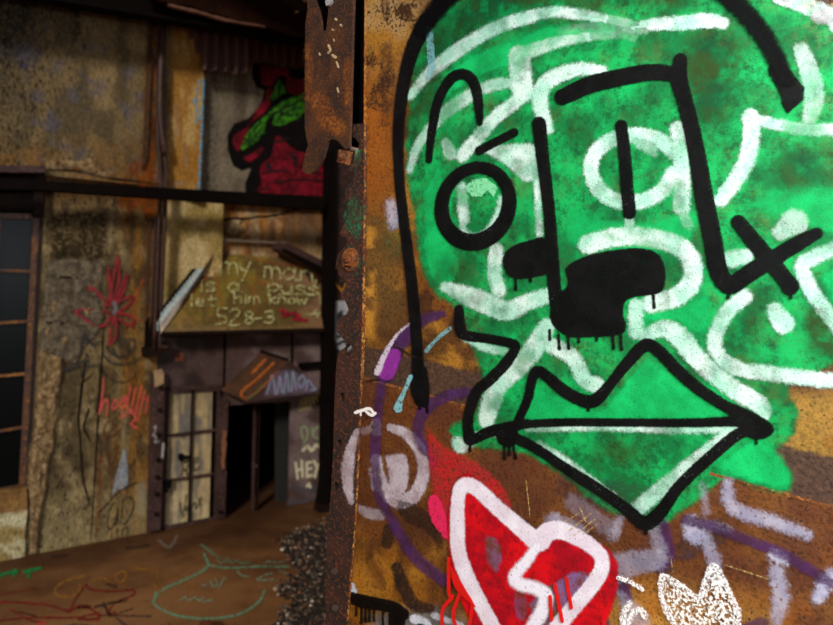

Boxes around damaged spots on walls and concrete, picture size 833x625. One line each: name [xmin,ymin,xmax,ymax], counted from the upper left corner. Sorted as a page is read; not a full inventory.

rust [305,45,345,134]
rust [118,197,158,249]